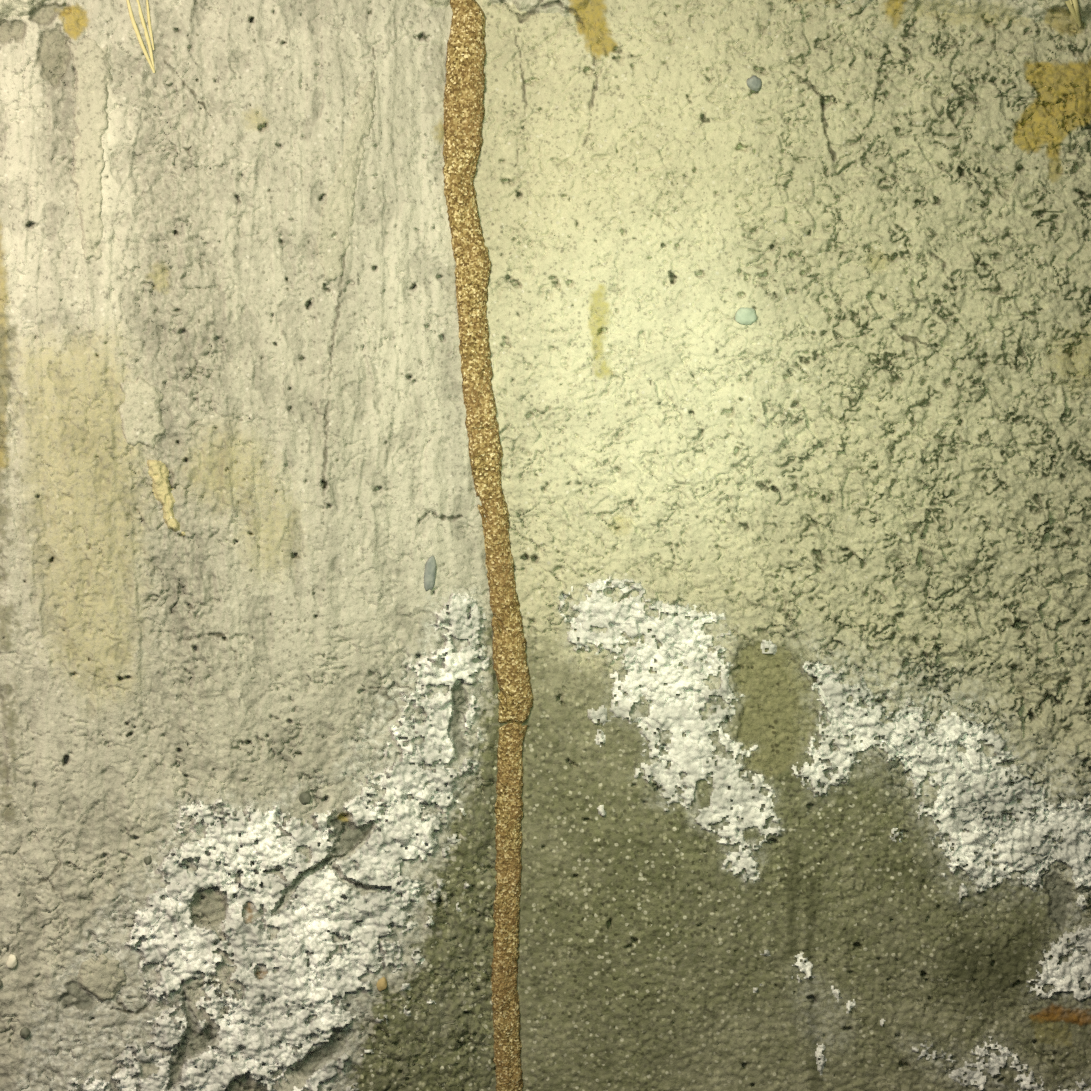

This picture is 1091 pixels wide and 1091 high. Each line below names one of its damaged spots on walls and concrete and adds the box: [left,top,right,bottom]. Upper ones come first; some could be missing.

leakage [0,269,17,481]
leakage [17,591,507,1091]
leakage [517,576,1091,1091]